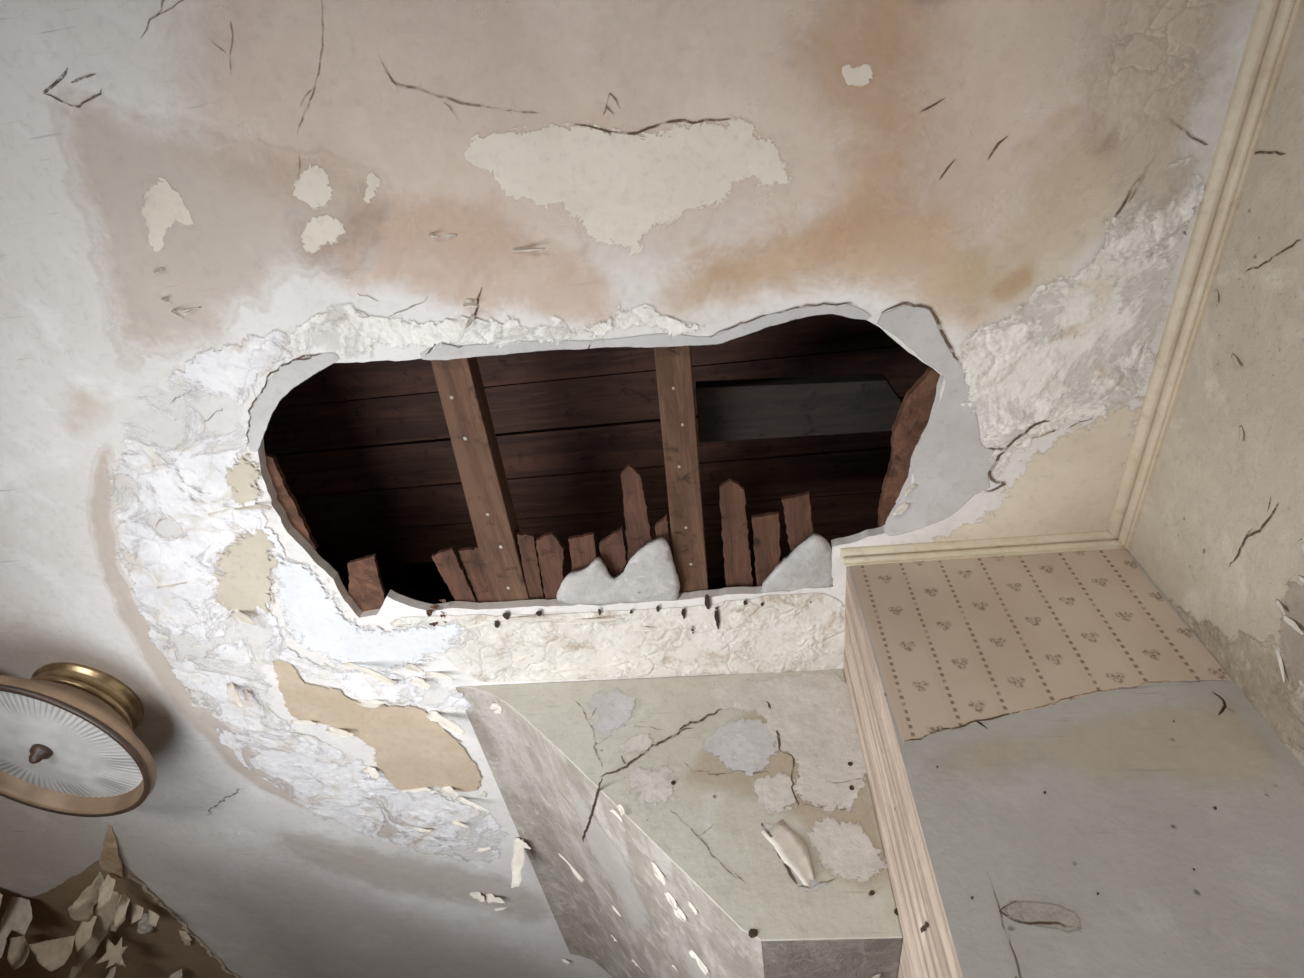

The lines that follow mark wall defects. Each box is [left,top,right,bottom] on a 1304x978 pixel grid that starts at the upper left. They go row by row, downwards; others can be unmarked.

crack [141,0,183,37]
crack [382,64,536,113]
crack [575,93,729,135]
peeling [464,116,794,256]
crack [1245,240,1300,272]
flaking render [208,353,339,515]
flaking render [420,299,1145,542]
crack [1229,496,1278,566]
flaking render [557,537,680,605]
crack [1213,692,1232,716]
peeling [702,670,888,892]
peeling [0,823,236,978]